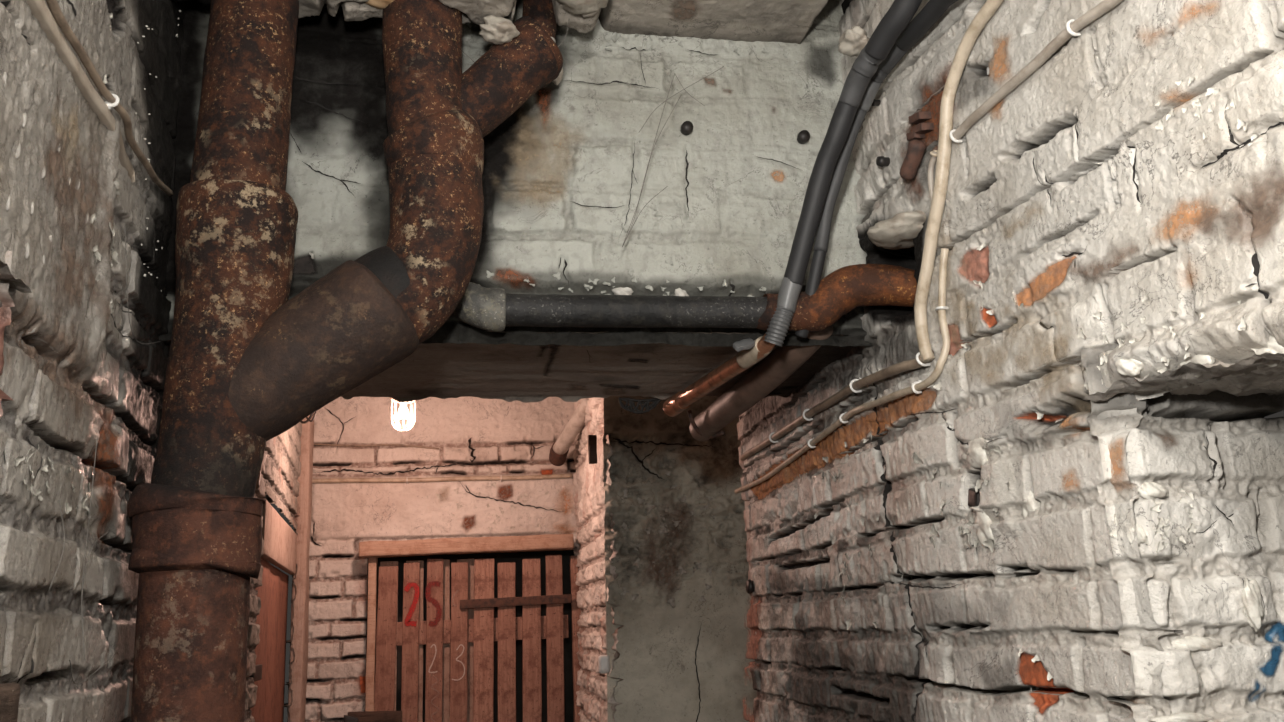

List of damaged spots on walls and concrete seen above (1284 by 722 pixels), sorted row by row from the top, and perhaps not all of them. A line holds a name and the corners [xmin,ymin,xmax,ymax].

crack [569,47,658,89]
crack [574,145,637,237]
crack [683,150,691,216]
spalling [959,243,997,328]
spalling [1011,254,1078,313]
crack [314,408,563,512]
flaking render [751,380,942,500]
crack [694,623,702,722]
spalling [1018,647,1076,714]